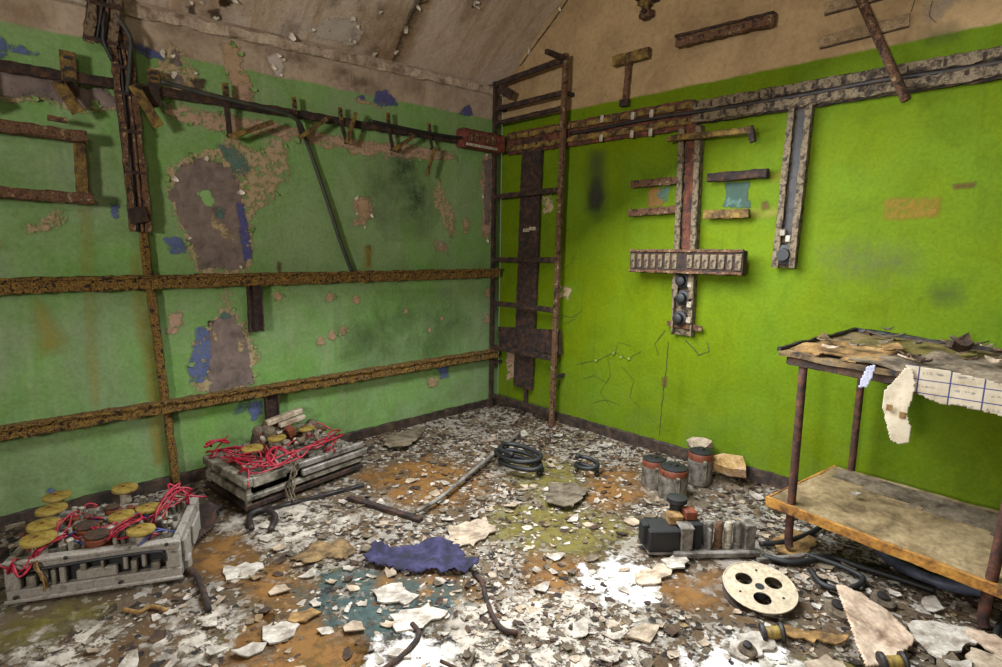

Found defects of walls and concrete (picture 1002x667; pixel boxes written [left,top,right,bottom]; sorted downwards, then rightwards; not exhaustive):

flaking render [188,1,222,20]
peeling [0,37,37,57]
peeling [0,72,116,113]
peeling [134,40,458,274]
peeling [166,310,183,334]
peeling [188,286,261,392]
peeling [427,366,449,387]
crack [576,331,709,434]
peeling [235,401,262,421]